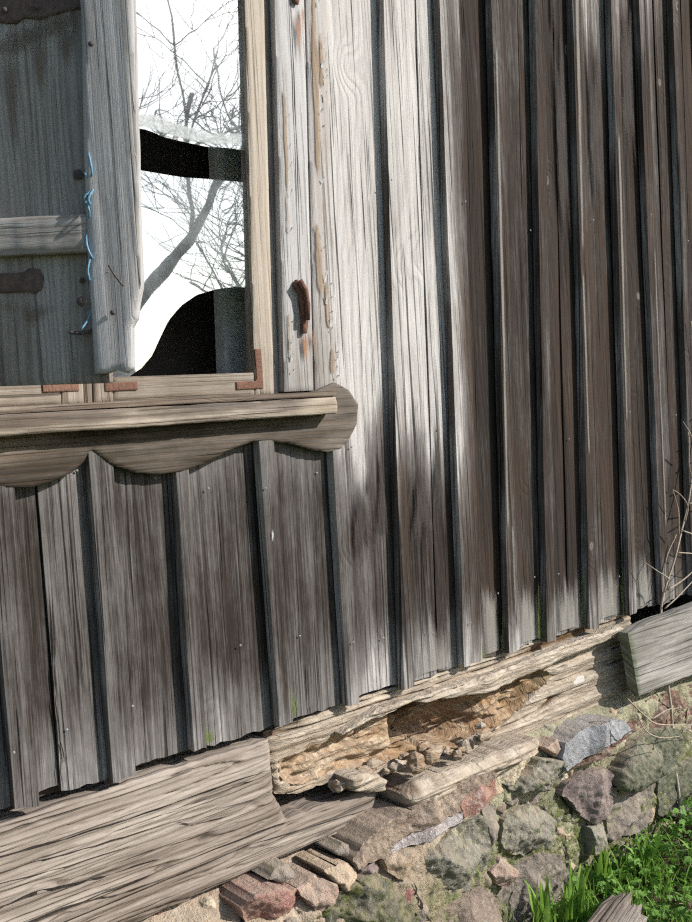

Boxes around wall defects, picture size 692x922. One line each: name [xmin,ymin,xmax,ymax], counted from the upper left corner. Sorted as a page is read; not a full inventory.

leakage [496,55,504,338]
leakage [354,458,387,559]
leakage [411,426,443,544]
leakage [423,633,443,673]
leakage [482,602,504,658]
leakage [515,589,543,642]
leakage [561,573,585,630]
leakage [601,555,625,618]
crack [0,769,375,922]